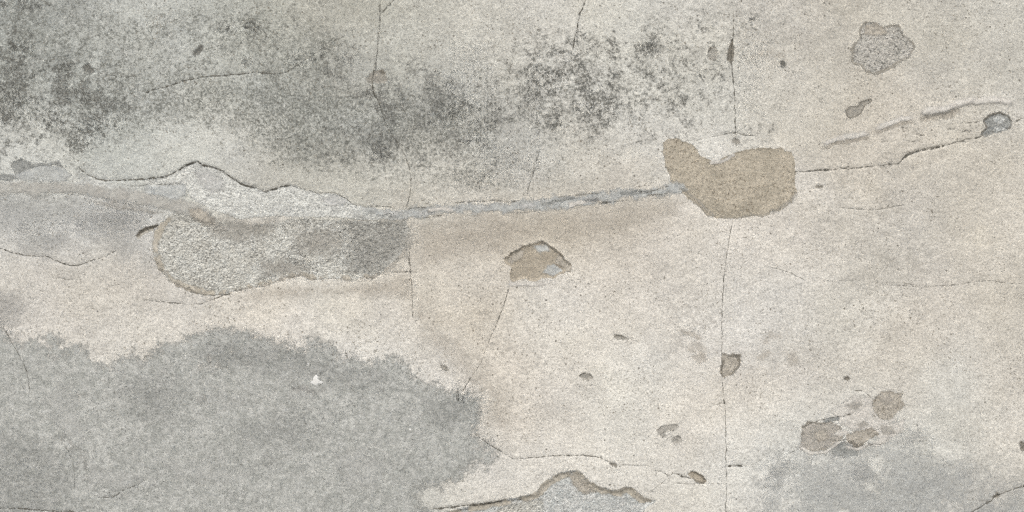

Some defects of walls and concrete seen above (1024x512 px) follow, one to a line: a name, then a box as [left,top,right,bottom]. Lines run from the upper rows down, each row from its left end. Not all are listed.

leakage [0,3,129,156]
leakage [353,85,404,123]
leakage [447,27,688,157]
spalling [850,22,915,75]
spalling [649,138,797,219]
crack [795,120,983,172]
spalling [136,161,441,296]
spalling [504,241,572,286]
crack [655,225,742,508]
leakage [0,321,499,512]
peeling [799,391,905,458]
spalling [450,470,656,512]